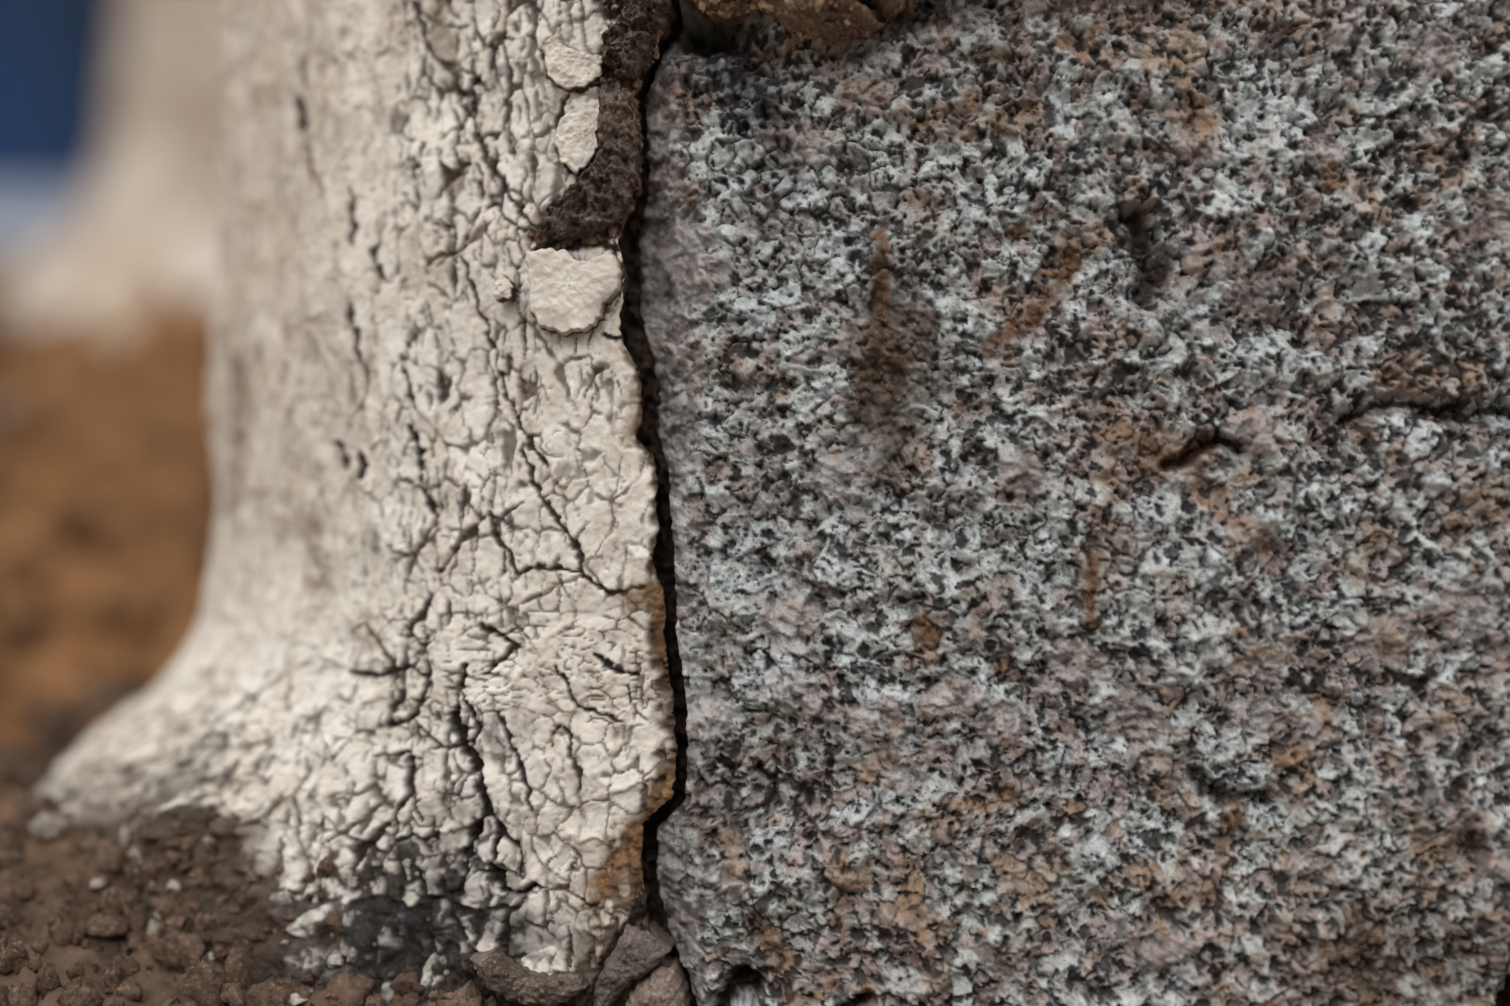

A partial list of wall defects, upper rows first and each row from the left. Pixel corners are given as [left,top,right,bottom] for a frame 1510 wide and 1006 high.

crack [299,99,315,178]
spalling [493,0,676,337]
crack [336,442,369,480]
crack [349,0,698,1006]